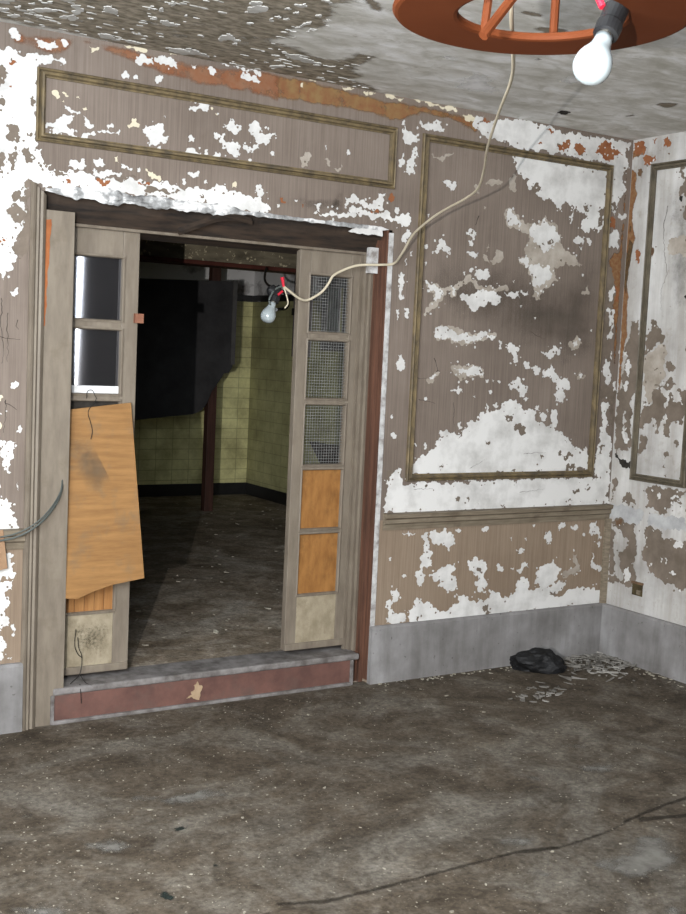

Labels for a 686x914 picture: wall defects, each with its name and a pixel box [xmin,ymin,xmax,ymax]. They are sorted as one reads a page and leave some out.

corrosion [15,35,70,52]
corrosion [106,47,477,132]
peeling [0,0,671,320]
peeling [676,167,686,220]
peeling [635,234,686,264]
peeling [606,286,615,340]
corrosion [600,170,639,454]
peeling [0,425,22,474]
peeling [383,319,686,624]
peeling [0,485,19,529]
peeling [0,553,16,660]